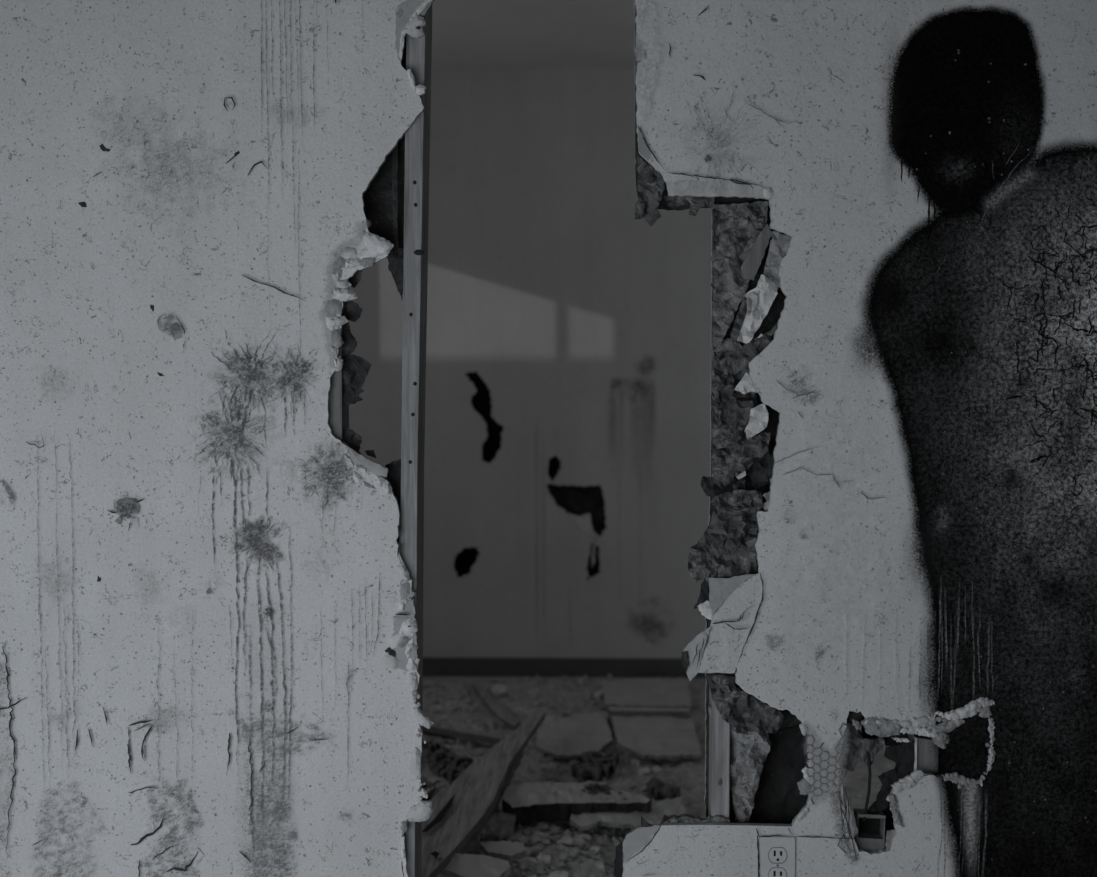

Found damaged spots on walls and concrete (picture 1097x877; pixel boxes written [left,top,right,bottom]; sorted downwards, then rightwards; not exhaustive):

water stain [261,0,328,117]
flaking render [395,0,435,96]
flaking render [666,173,773,200]
flaking render [319,224,394,372]
water stain [303,449,352,519]
flaking render [337,443,392,496]
water stain [182,331,318,877]
peeling [697,600,714,620]
crack [0,649,26,859]
flaking render [383,525,434,877]
flaking render [795,697,996,864]
peeling [614,815,670,877]